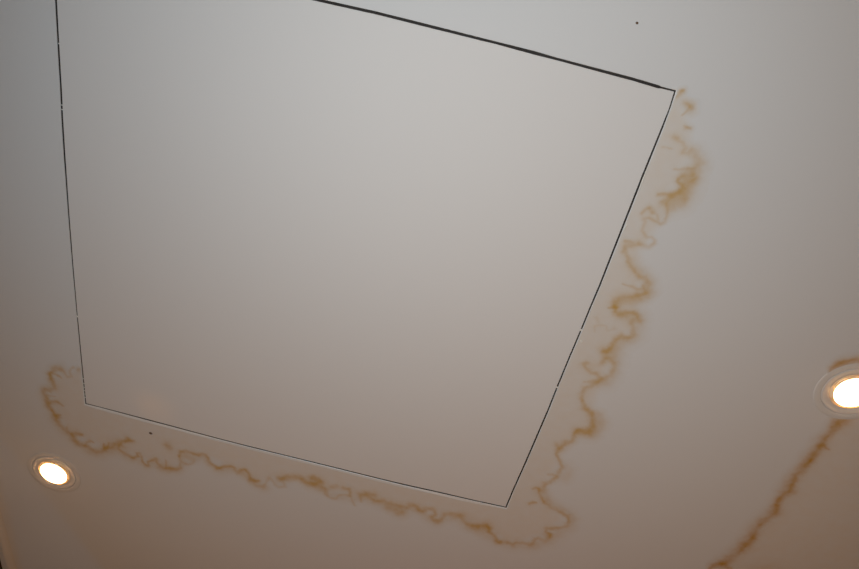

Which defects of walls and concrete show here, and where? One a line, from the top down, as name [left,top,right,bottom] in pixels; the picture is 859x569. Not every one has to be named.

damp [34,84,716,556]
damp [824,351,859,374]
damp [704,416,859,569]